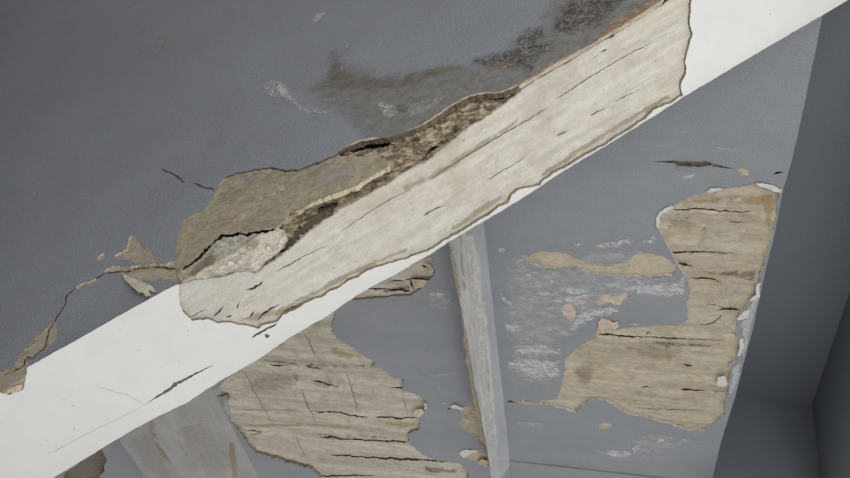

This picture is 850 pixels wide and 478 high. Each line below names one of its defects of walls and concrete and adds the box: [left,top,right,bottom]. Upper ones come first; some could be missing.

leakage [312,0,659,139]
crack [162,169,215,191]
flaking render [97,0,693,338]
crack [653,161,735,172]
peeling [0,321,59,395]
crack [5,265,180,375]
flaking render [218,312,489,478]
leakage [500,239,685,384]
flaking render [518,167,782,431]